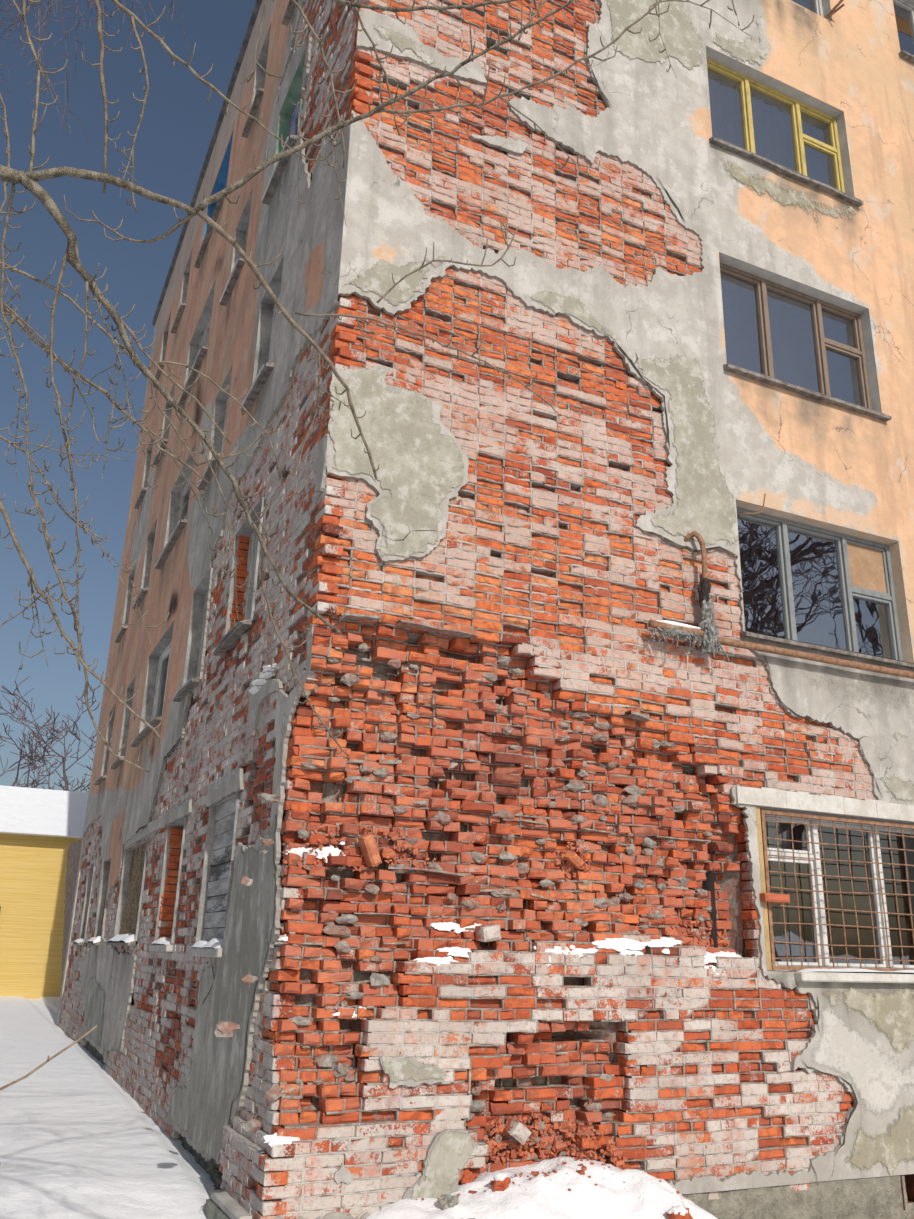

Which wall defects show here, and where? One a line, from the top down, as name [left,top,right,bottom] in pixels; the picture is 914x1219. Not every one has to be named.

spalling [286,0,768,287]
spalling [59,256,914,1138]
spalling [254,814,854,1219]